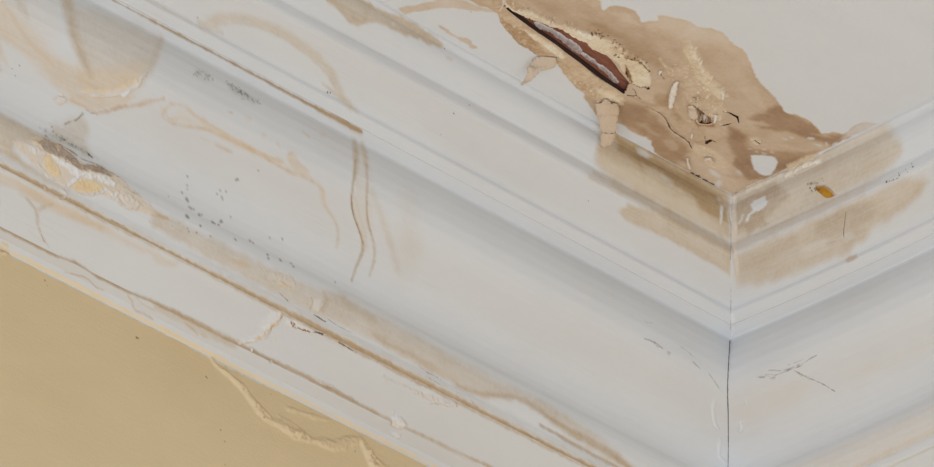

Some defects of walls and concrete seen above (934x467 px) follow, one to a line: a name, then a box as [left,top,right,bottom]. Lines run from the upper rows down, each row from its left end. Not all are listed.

water stain [0,0,360,271]
water stain [323,0,507,63]
flaking render [492,0,733,171]
water stain [516,0,933,292]
peeling [237,309,315,352]
peeling [307,374,336,391]
water stain [147,134,640,467]
crack [643,194,740,467]
crack [753,354,836,393]